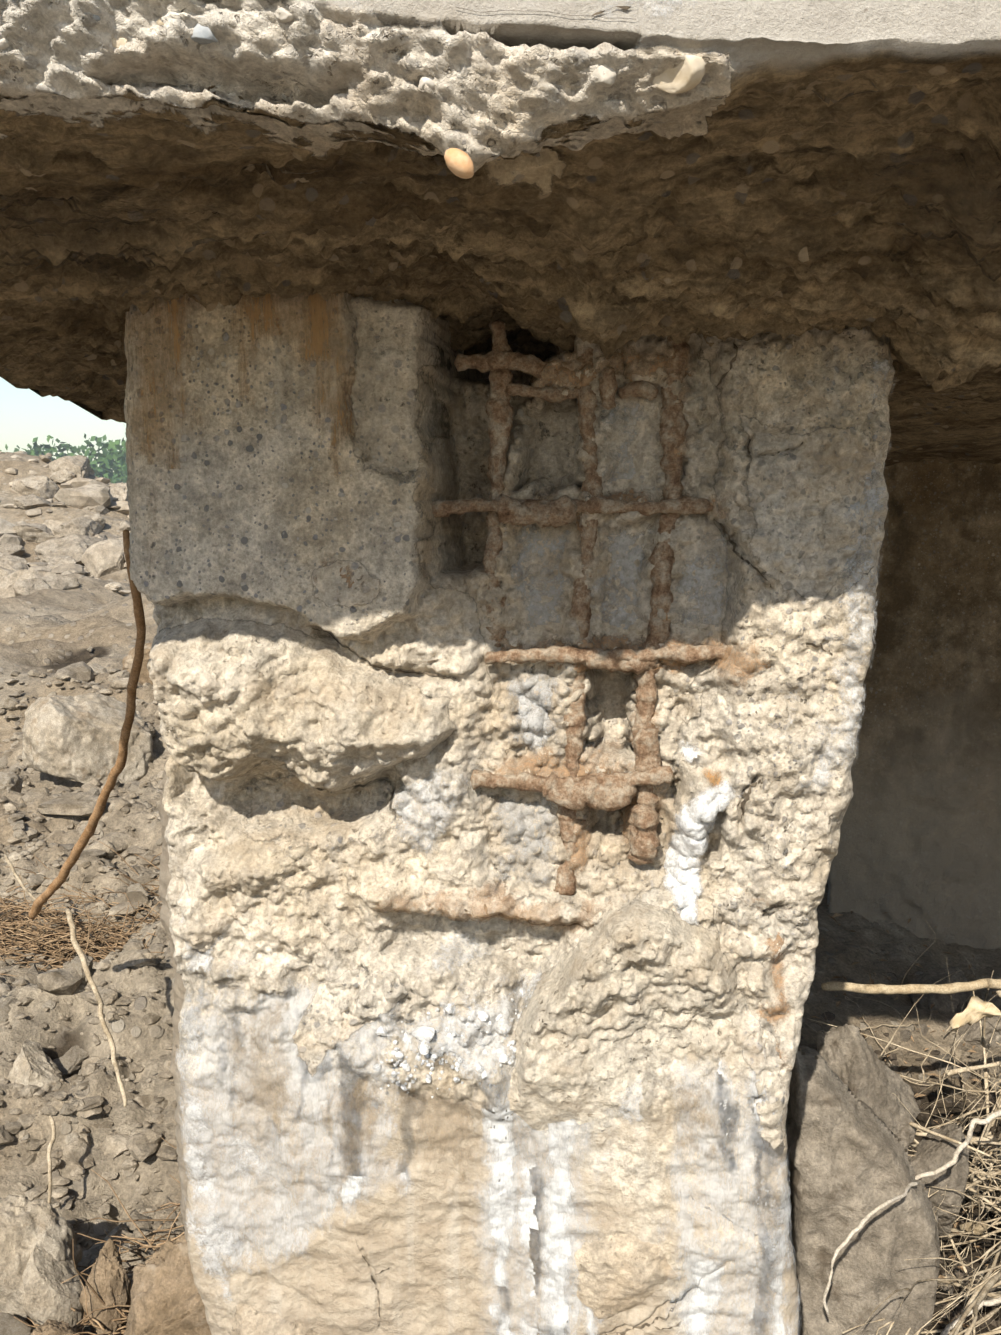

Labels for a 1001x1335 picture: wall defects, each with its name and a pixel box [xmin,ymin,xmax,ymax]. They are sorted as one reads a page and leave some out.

spalling [0,0,731,195]
spalling [739,415,876,603]
crack [312,628,456,679]
spalling [339,292,733,913]
rust [495,635,643,673]
rust [655,637,771,685]
rust [496,750,634,778]
rust [619,797,637,836]
water stain [664,781,740,925]
water stain [177,973,540,1296]
water stain [420,1079,594,1335]
crack [605,1299,684,1335]